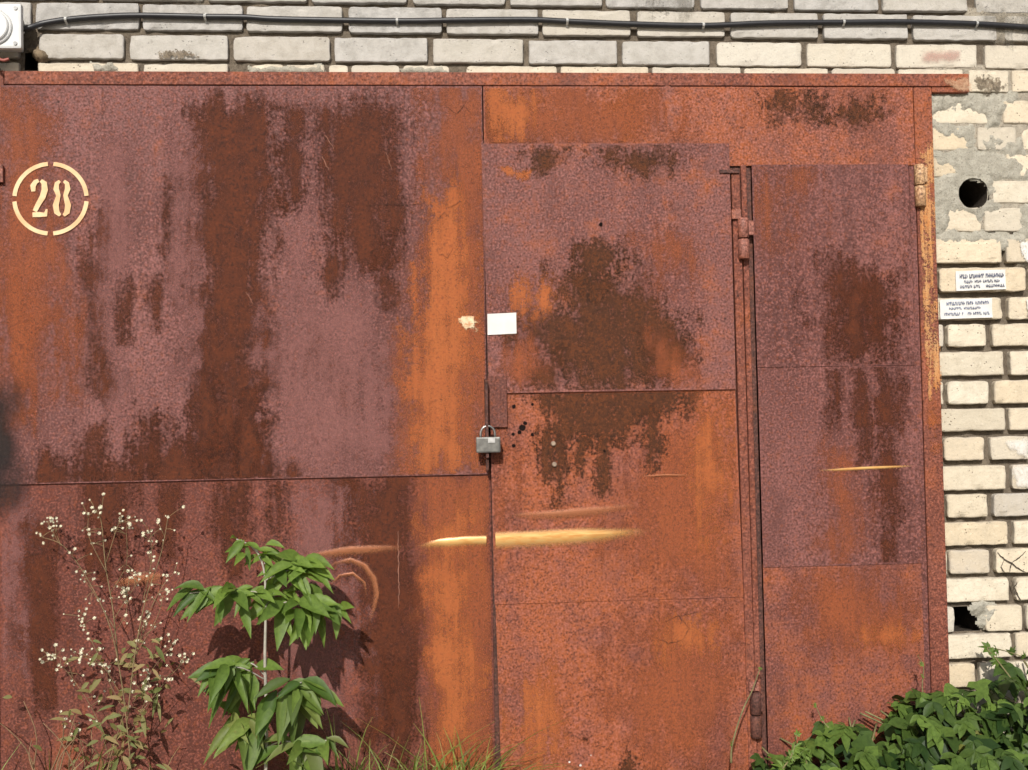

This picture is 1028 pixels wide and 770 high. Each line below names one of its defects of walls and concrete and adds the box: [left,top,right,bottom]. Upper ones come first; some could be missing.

peeling [932,94,945,114]
peeling [982,109,1002,130]
spalling [959,179,989,208]
corrosion [793,245,910,563]
corrosion [0,87,703,770]
spalling [950,600,997,634]